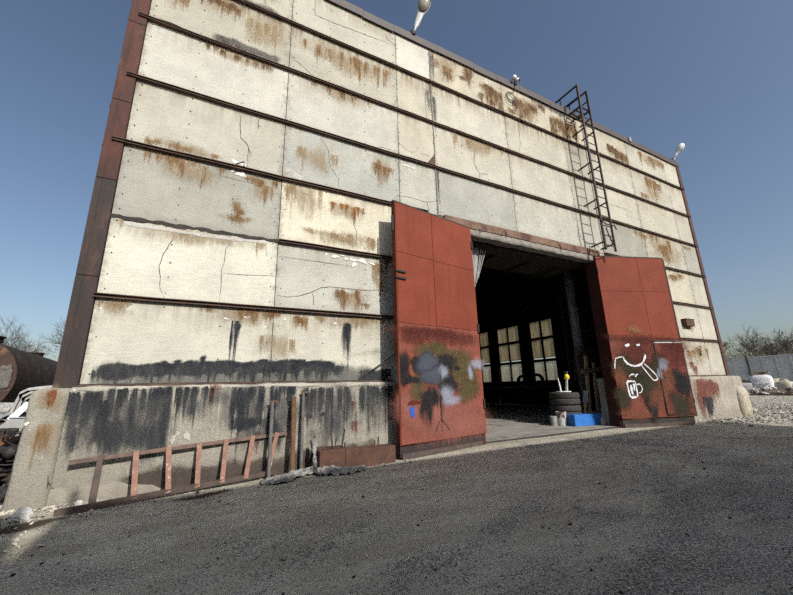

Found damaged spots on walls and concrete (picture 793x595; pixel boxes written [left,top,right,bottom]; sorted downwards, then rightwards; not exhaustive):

corrosion [316,45,389,83]
corrosion [434,59,472,81]
corrosion [479,84,578,142]
corrosion [374,158,394,180]
corrosion [607,143,629,165]
corrosion [228,203,245,222]
corrosion [307,228,374,247]
corrosion [335,289,383,327]
corrosion [40,389,59,409]
water stain [64,364,344,448]
water stain [311,386,393,425]
water stain [123,450,314,489]